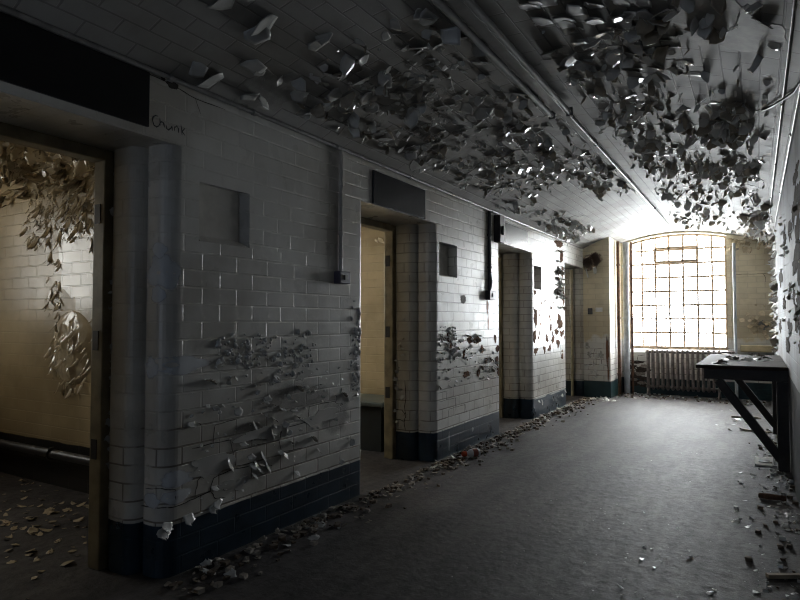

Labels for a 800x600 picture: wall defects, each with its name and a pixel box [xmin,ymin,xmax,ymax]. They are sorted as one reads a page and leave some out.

peeling [205,0,253,10]
peeling [189,61,224,88]
peeling [234,8,636,359]
peeling [518,0,800,354]
peeling [0,140,95,327]
peeling [437,333,500,390]
peeling [187,363,359,514]
peeling [156,522,173,541]
peeling [183,512,196,526]